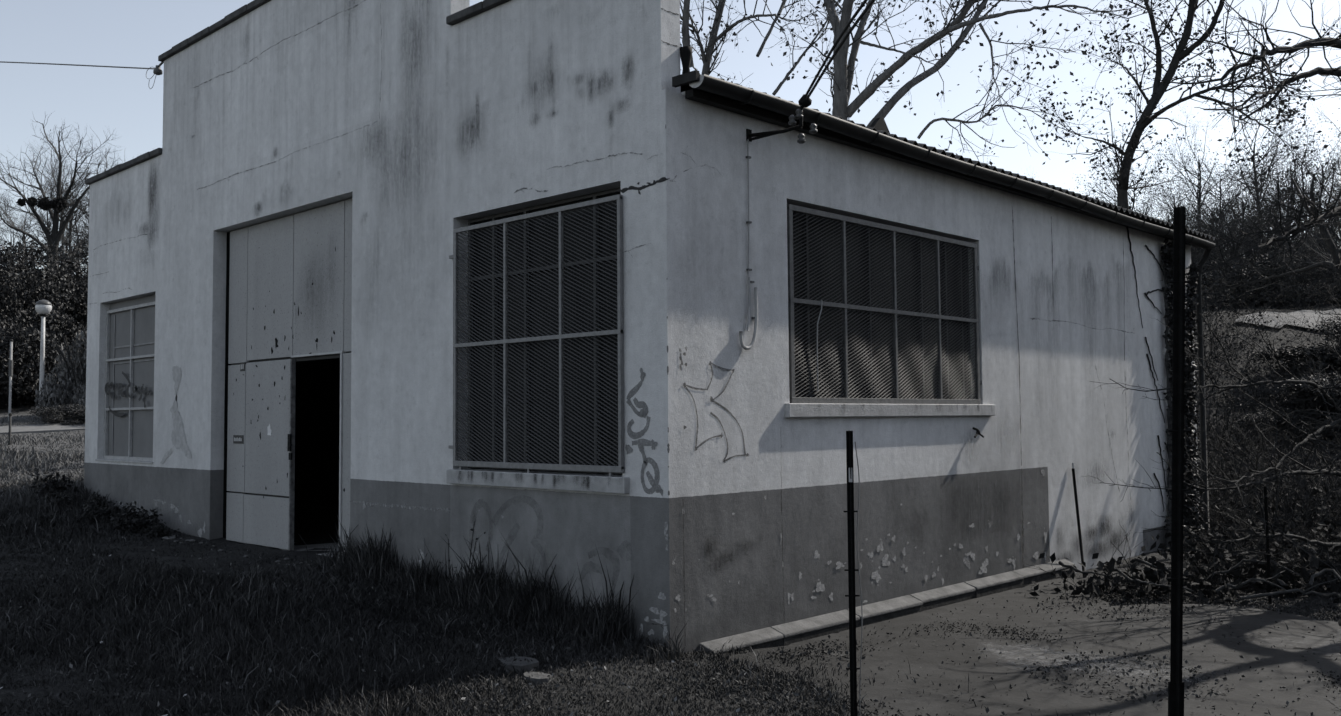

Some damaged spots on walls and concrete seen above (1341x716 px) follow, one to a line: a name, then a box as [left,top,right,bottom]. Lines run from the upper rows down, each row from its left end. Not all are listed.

crack [514,146,693,195]
peeling [814,534,1016,586]
peeling [811,579,833,601]
peeling [640,592,687,646]